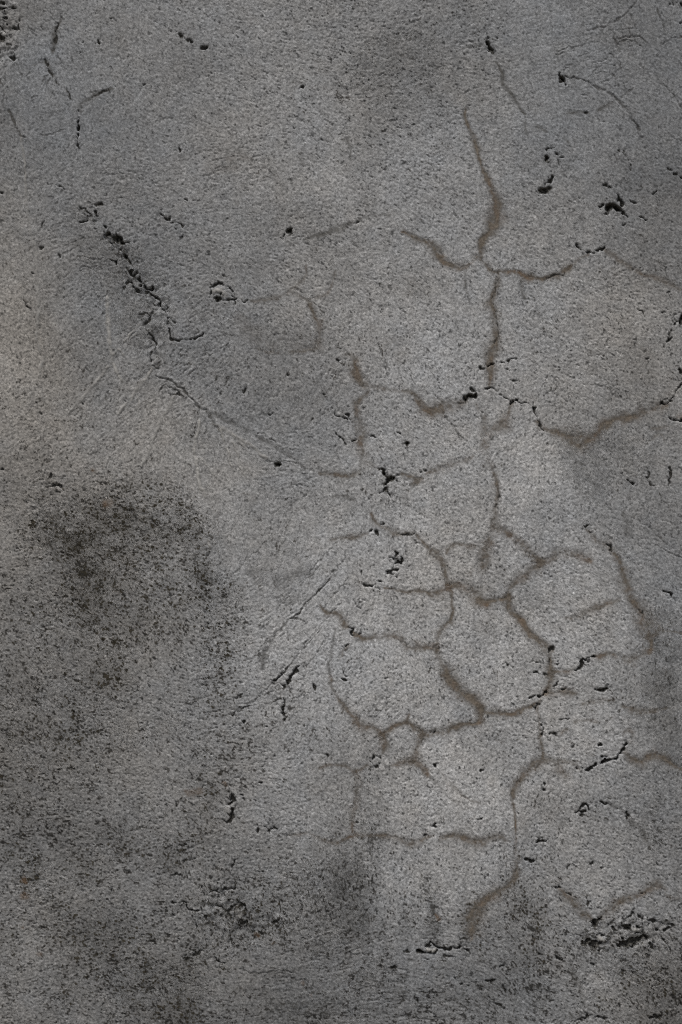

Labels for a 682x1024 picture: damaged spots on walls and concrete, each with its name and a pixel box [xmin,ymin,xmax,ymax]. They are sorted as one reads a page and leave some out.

crack [401,109,682,448]
crack [159,377,219,430]
crack [351,360,364,451]
crack [320,605,374,641]
crack [331,473,614,776]
crack [575,544,653,654]
crack [337,734,545,845]
crack [576,743,682,771]
crack [466,865,518,940]
crack [555,886,652,929]